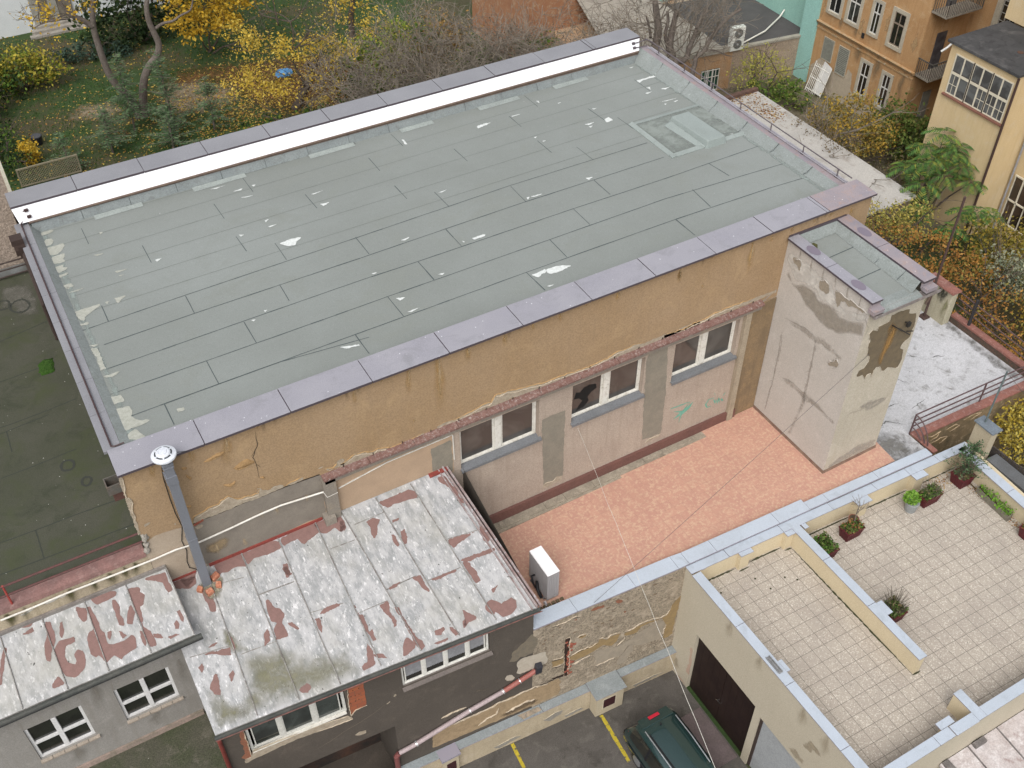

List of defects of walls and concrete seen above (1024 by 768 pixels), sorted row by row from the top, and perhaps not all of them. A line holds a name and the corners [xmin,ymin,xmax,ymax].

leakage [789,277,862,334]
flaking render [437,290,776,428]
flaking render [857,309,916,379]
spalling [119,477,151,554]
peeling [214,517,346,574]
peeling [367,489,417,547]
peeling [14,572,216,688]
peeling [198,637,235,695]
peeling [264,599,299,646]
peeling [315,603,387,670]
flaking render [432,576,681,748]
flaking render [239,684,367,763]